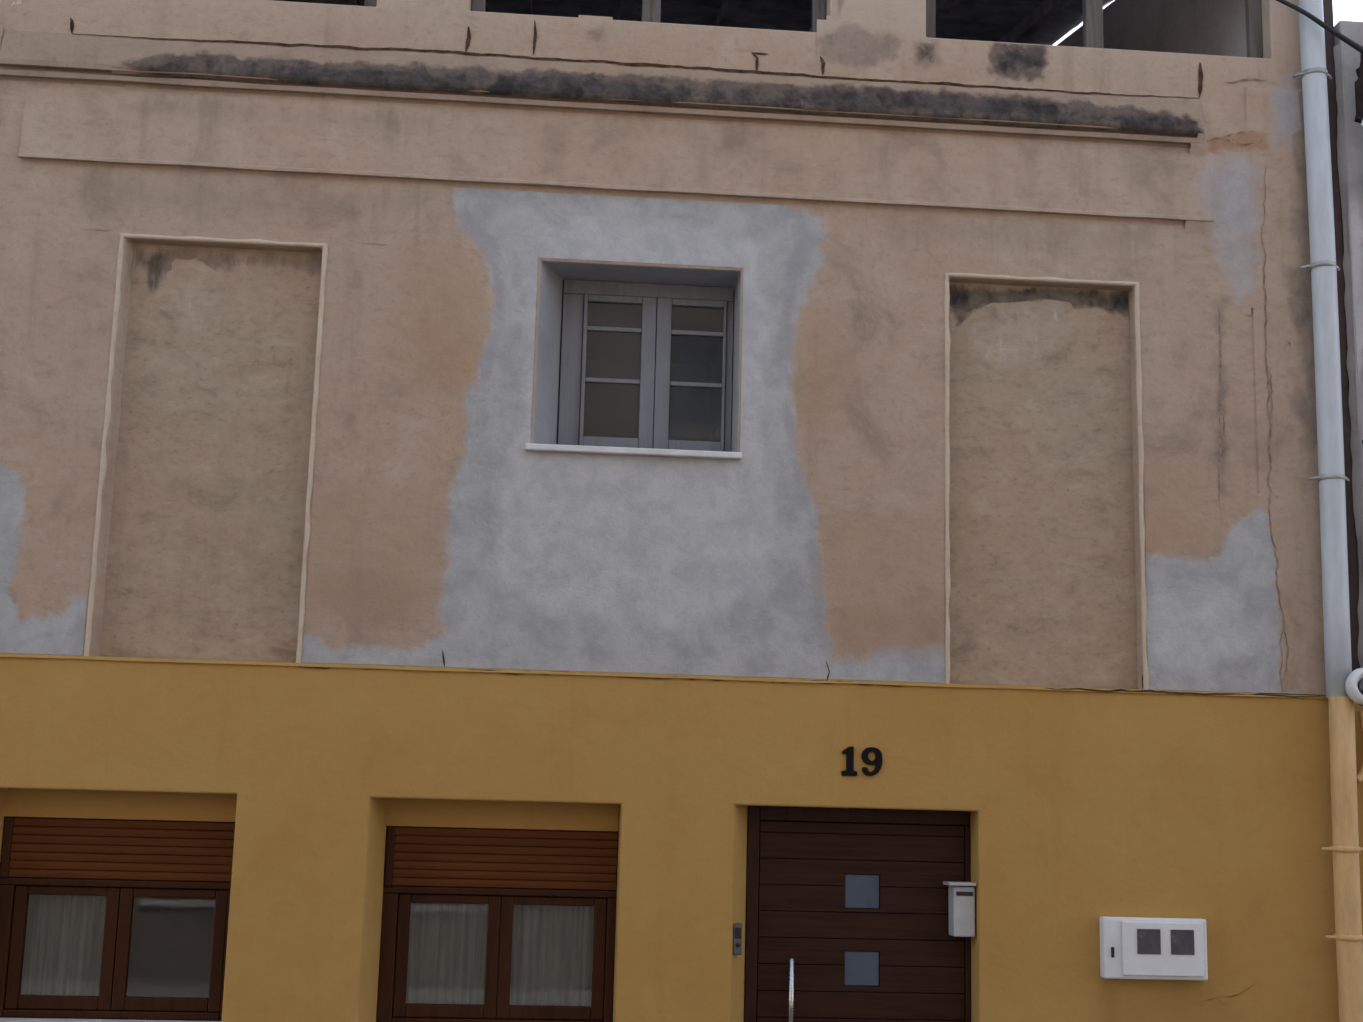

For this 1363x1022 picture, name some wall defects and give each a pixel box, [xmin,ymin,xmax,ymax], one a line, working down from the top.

leakage [47,90,512,423]
leakage [111,0,1204,377]
crack [1048,131,1325,698]